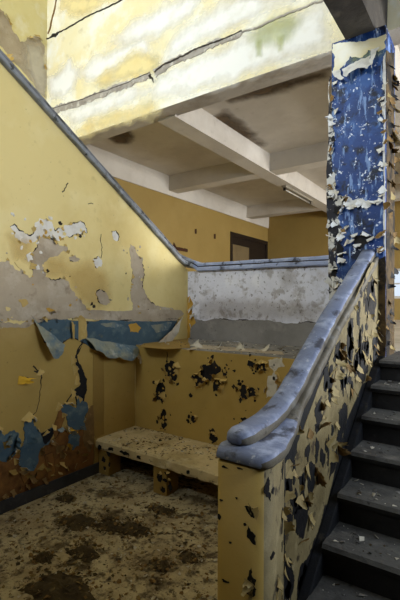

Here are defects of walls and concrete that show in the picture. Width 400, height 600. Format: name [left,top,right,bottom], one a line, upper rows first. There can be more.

peeling [0,0,292,98]
crack [46,0,324,114]
leakage [110,131,132,144]
leakage [215,114,263,145]
peeling [152,3,400,600]
crack [62,340,87,407]
flaking render [0,216,316,499]